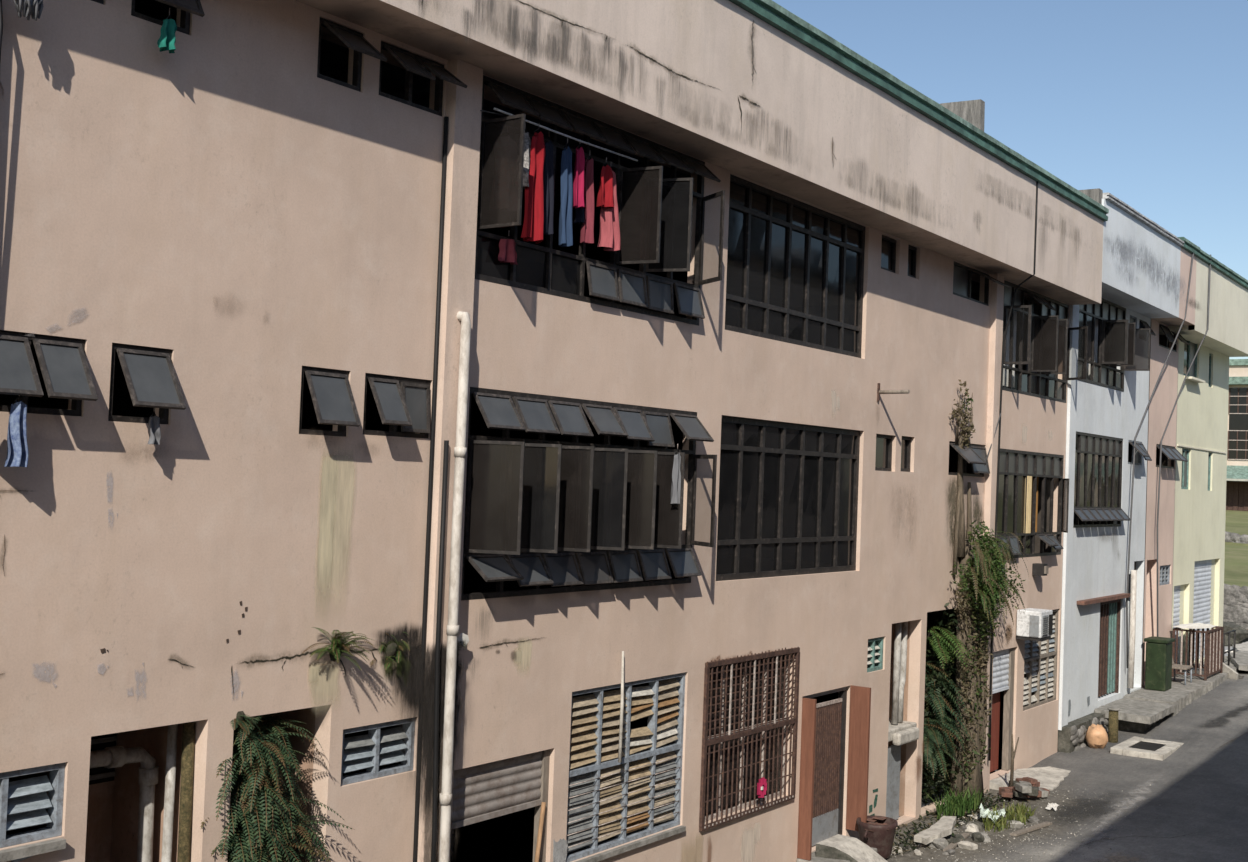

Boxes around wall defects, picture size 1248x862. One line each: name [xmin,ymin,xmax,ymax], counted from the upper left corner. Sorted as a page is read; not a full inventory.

crack [518,0,759,127]
water stain [318,459,354,583]
crack [231,649,379,694]
water stain [379,625,464,862]